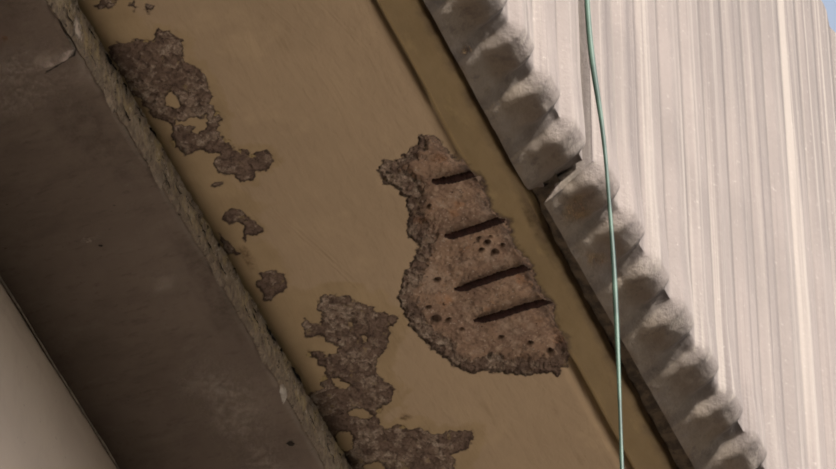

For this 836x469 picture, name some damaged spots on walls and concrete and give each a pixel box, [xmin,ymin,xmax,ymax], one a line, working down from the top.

spalling [46,0,570,469]